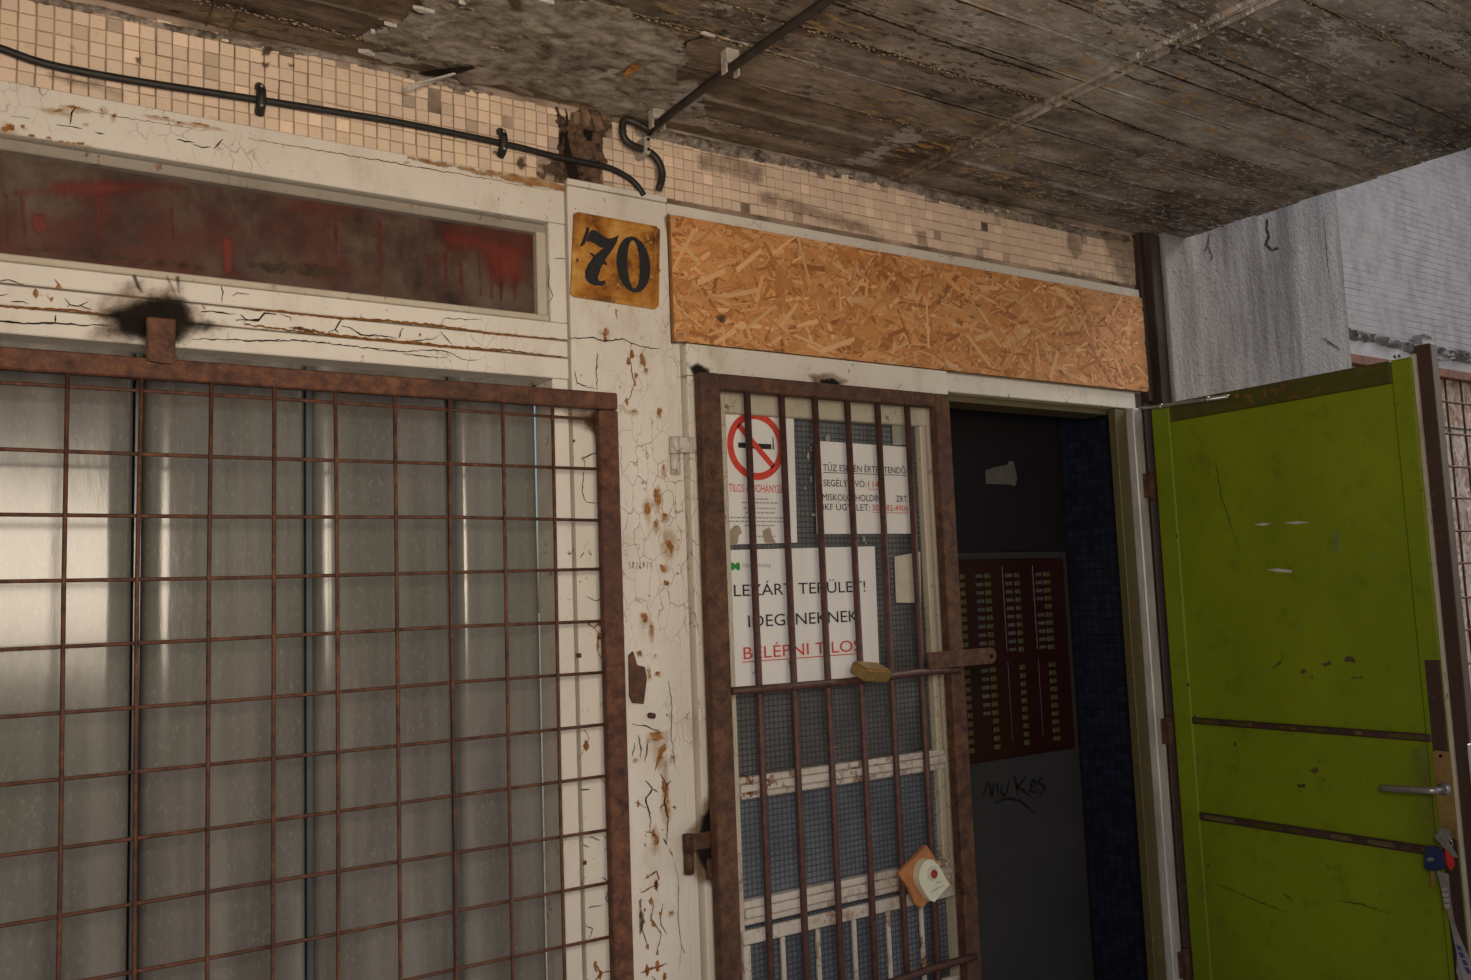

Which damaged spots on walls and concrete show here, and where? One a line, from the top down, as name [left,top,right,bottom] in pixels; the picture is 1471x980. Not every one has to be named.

crack [0,107,546,190]
spalling [33,0,1131,242]
crack [0,279,106,326]
crack [193,286,479,361]
crack [570,309,659,405]
crack [581,453,596,503]
corrosion [645,489,674,585]
corrosion [650,732,674,762]